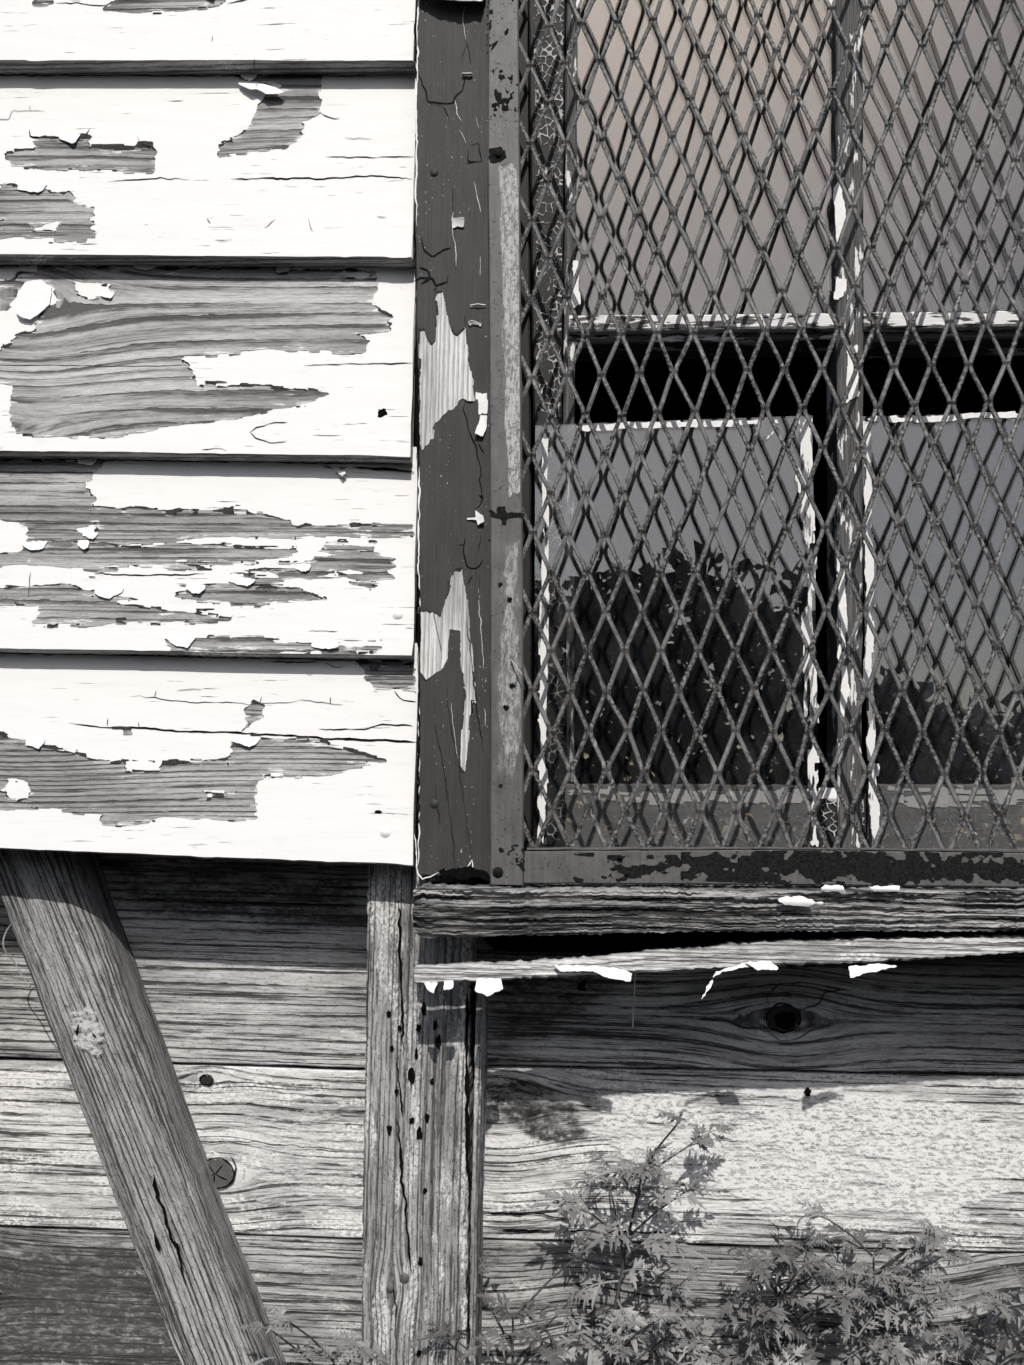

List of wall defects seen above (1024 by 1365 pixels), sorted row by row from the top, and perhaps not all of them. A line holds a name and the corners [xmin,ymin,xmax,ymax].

peeling [103,0,226,14]
peeling [217,73,322,157]
peeling [0,132,157,243]
peeling [0,265,393,439]
peeling [0,458,476,772]
crack [73,400,486,880]
peeling [0,699,387,827]
crack [111,898,359,906]
crack [200,1141,357,1188]
crack [393,900,412,1339]
crack [153,1174,185,1282]
crack [464,1275,472,1345]